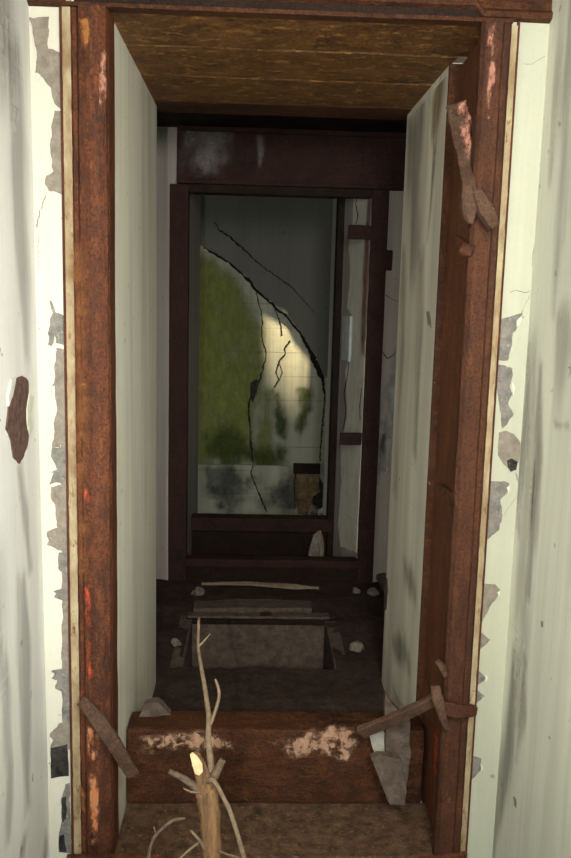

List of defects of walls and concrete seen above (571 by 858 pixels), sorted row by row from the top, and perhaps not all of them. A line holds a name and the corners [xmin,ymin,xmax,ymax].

peeling [80,18,90,46]
peeling [29,16,62,194]
spalling [0,376,34,464]
crack [203,222,362,513]
peeling [497,313,523,472]
peeling [487,481,510,539]
peeling [45,300,99,854]
peeling [482,584,500,621]
peeling [143,731,231,751]
peeling [286,725,357,761]